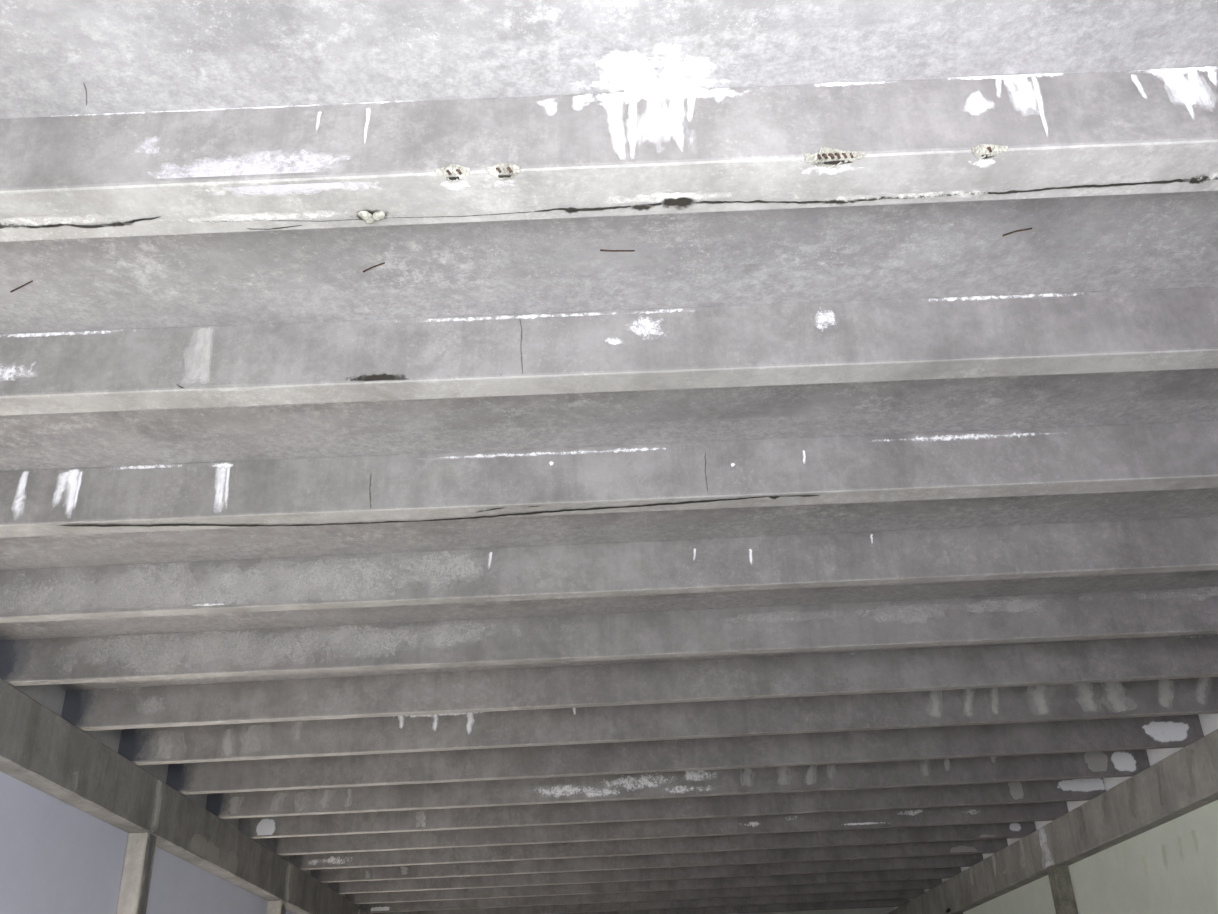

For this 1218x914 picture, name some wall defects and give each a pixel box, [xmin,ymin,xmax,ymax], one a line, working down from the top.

damp [958,73,1062,130]
spalling [436,164,470,189]
spalling [487,163,521,185]
spalling [804,147,865,174]
crack [396,175,1218,218]
crack [0,216,161,229]
crack [247,219,361,230]
damp [916,433,1046,441]
damp [446,448,666,465]
damp [14,472,28,513]
damp [54,469,82,512]
damp [213,463,233,506]